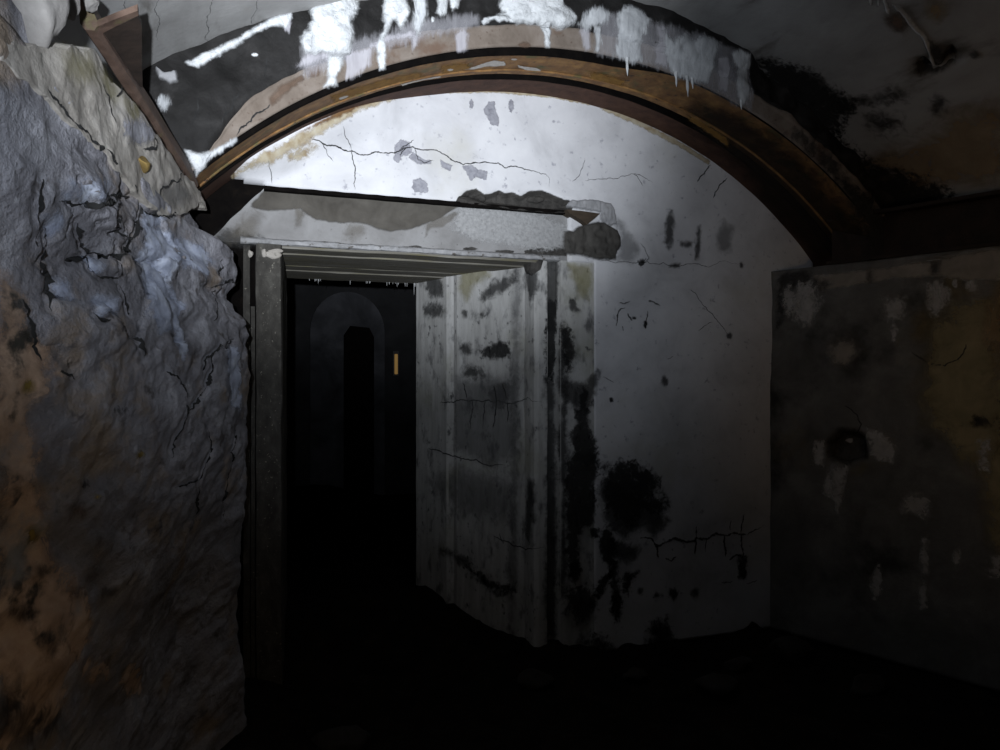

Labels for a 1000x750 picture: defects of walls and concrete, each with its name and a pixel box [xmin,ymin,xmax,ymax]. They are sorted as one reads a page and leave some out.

leakage [186,13,292,67]
leakage [270,0,460,104]
leakage [482,0,751,110]
crack [47,88,118,165]
crack [99,71,123,122]
leakage [158,95,169,111]
crack [312,130,650,187]
spalling [393,140,572,213]
spalling [469,99,499,126]
crack [23,170,183,379]
leakage [252,191,670,651]
crack [640,515,761,584]